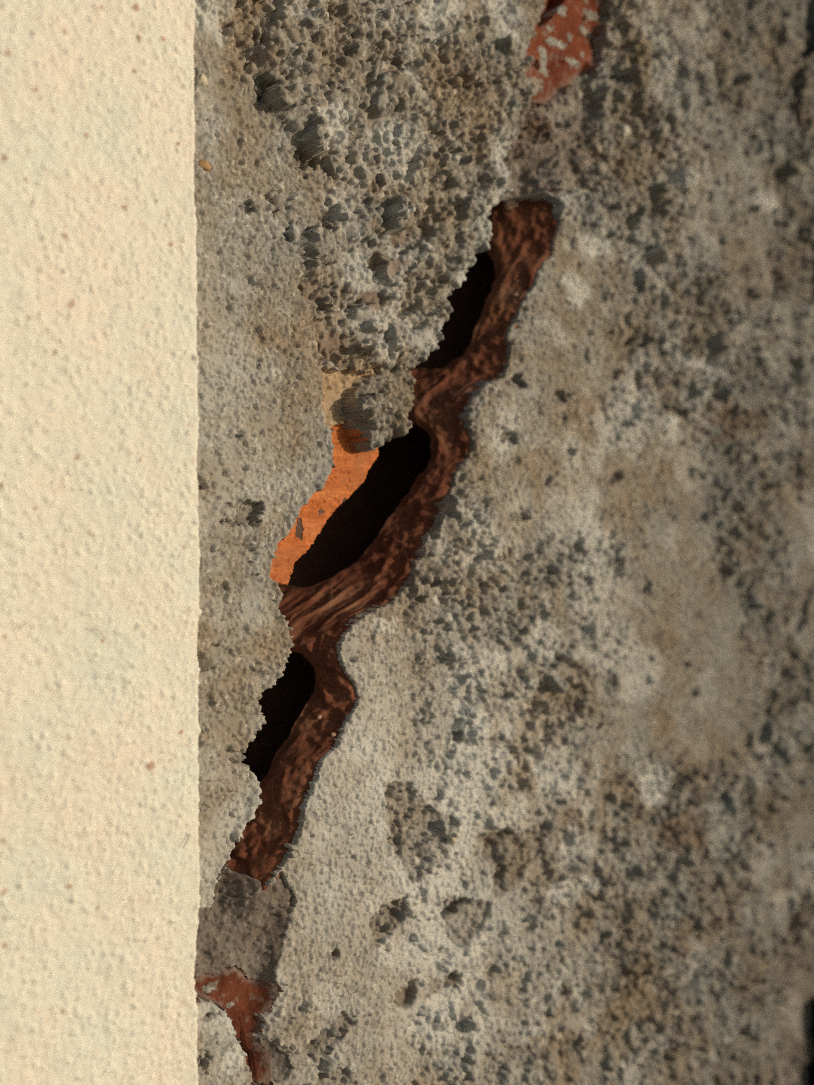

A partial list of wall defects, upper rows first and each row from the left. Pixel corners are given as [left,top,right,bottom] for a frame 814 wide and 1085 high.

spalling [261,177,444,585]
spalling [507,371,528,389]
spalling [224,499,265,529]
crack [194,0,610,1085]
peeling [384,781,463,865]